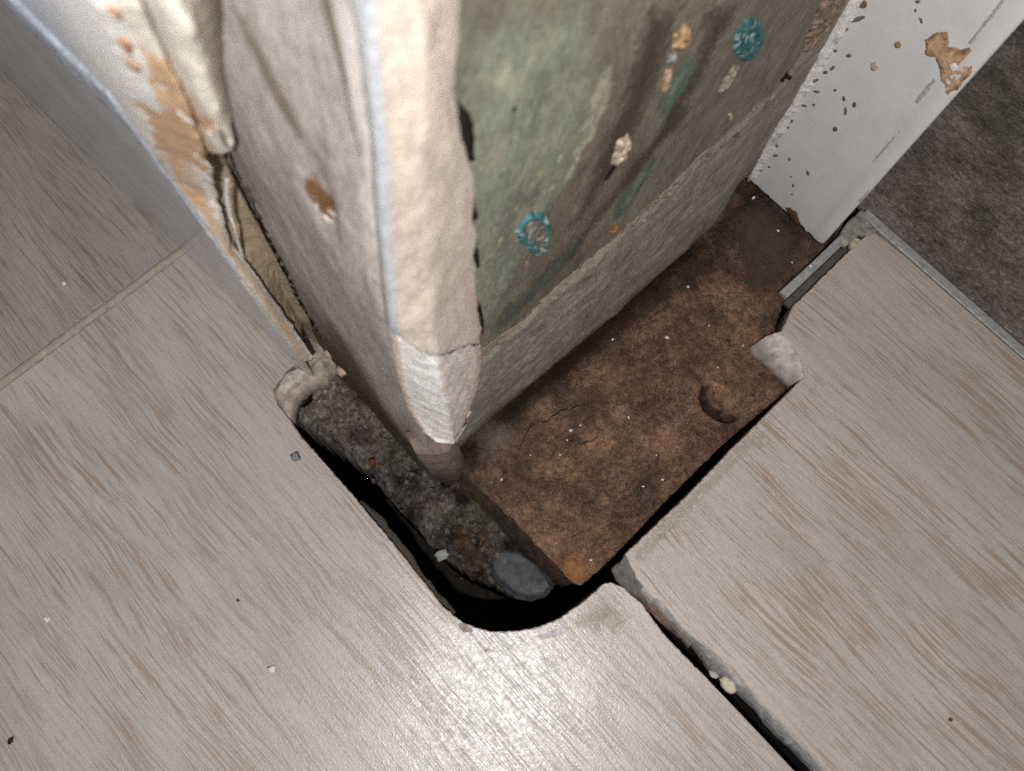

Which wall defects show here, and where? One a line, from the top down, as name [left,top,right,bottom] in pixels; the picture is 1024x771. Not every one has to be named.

flaking render [176,109,221,151]
flaking render [153,148,314,362]
crack [224,147,322,339]
flaking render [304,180,337,223]
flaking render [348,0,722,484]
peeling [915,0,1005,104]